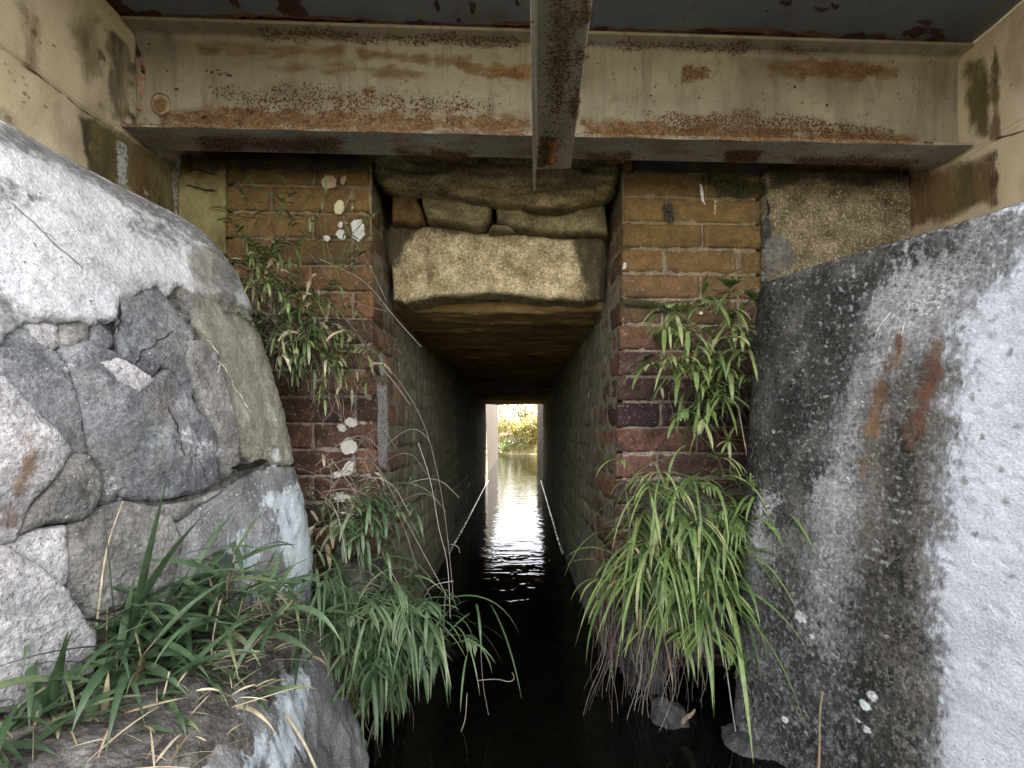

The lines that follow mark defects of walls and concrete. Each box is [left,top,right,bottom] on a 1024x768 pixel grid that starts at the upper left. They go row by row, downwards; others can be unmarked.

water stain [80,118,96,163]
water stain [77,29,136,123]
rust [121,66,529,154]
rust [244,0,933,172]
water stain [964,58,990,136]
rust [15,451,37,492]
water stain [734,156,1024,768]